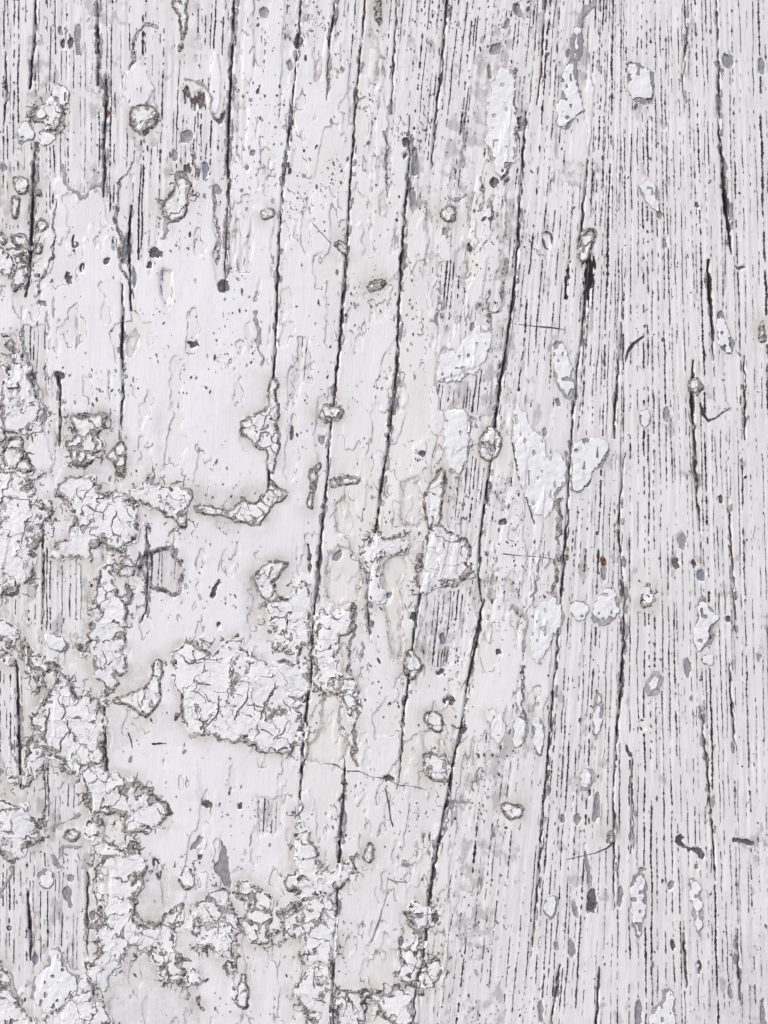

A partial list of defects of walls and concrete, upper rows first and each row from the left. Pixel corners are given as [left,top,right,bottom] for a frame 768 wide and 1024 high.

peeling [16,83,70,146]
peeling [484,42,524,188]
peeling [0,163,42,219]
peeling [0,217,49,292]
crack [687,0,750,531]
crack [299,0,590,1024]
peeling [0,322,620,1024]